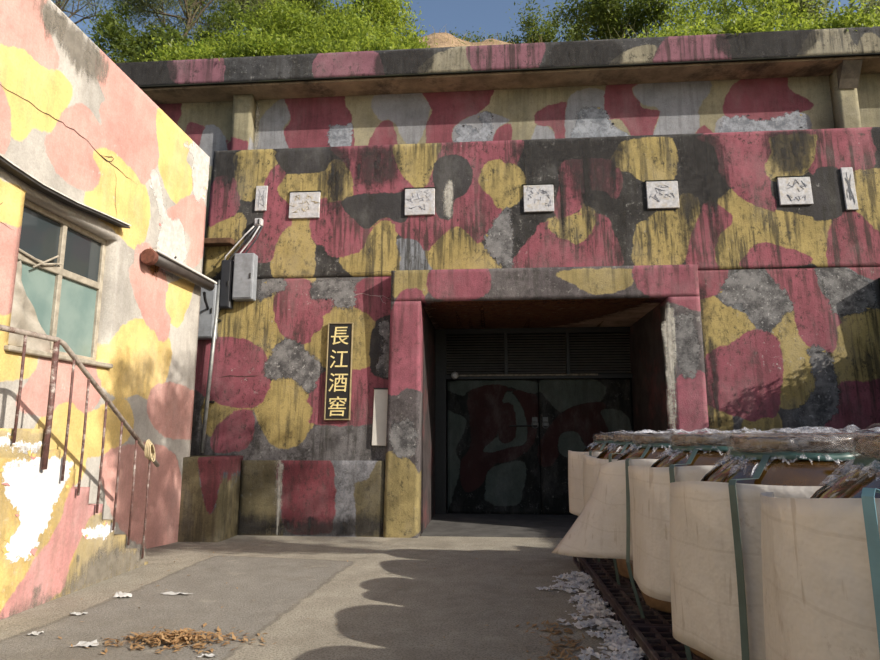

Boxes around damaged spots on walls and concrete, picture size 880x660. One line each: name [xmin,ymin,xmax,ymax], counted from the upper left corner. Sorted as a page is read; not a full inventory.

crack [0,84,133,212]
damp [327,146,400,219]
damp [444,181,453,217]
damp [514,138,627,257]
damp [680,134,729,252]
damp [765,130,815,174]
peeling [0,432,74,564]